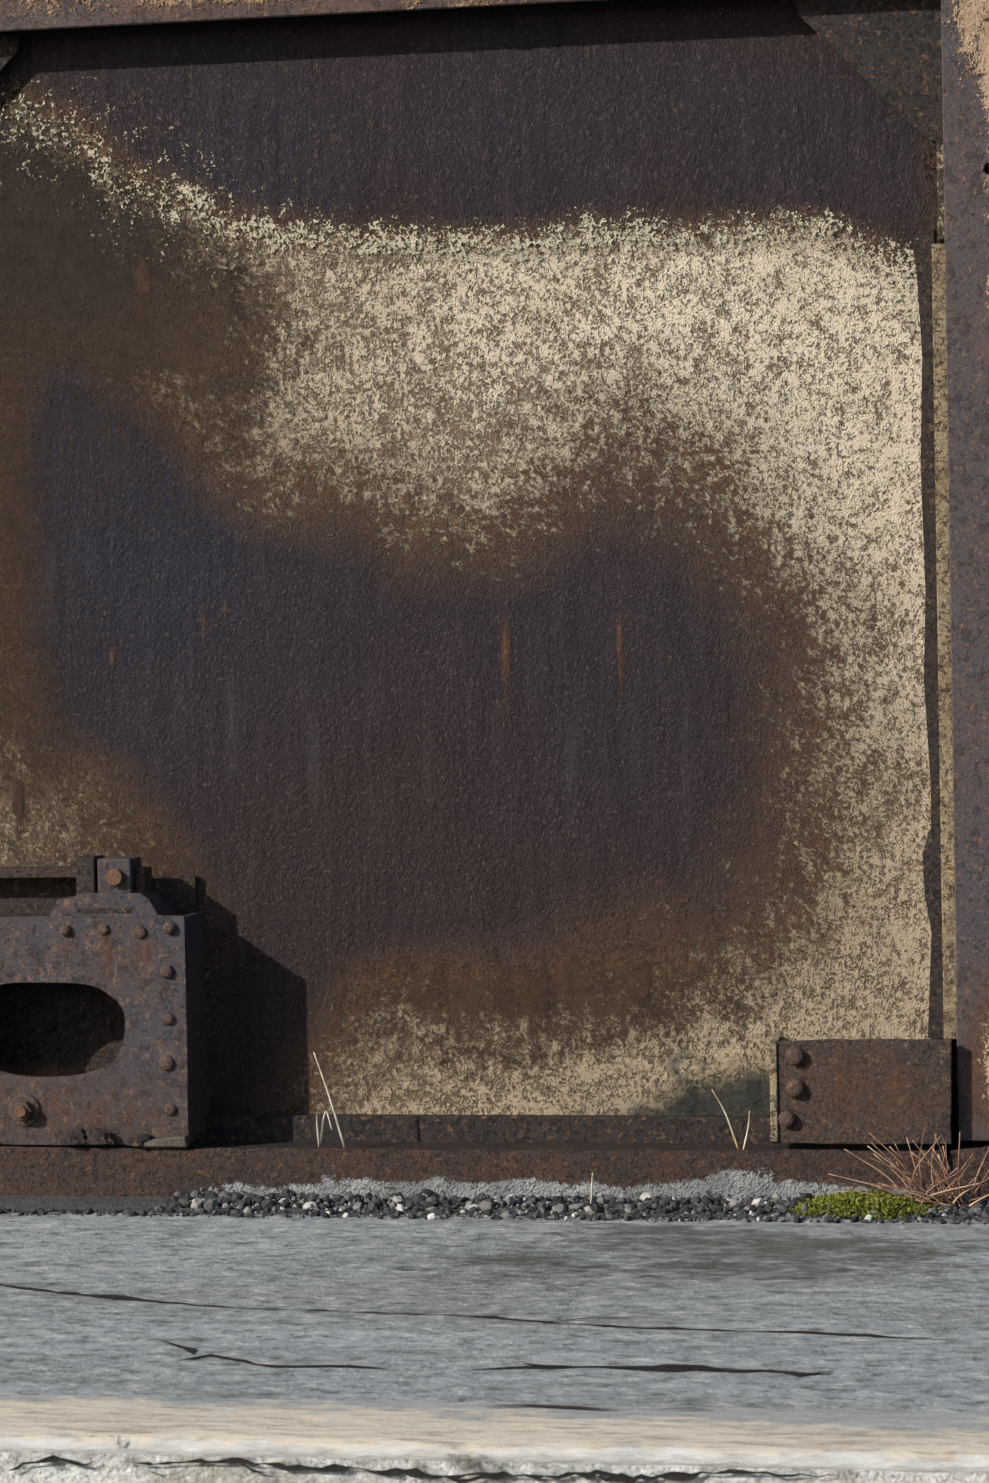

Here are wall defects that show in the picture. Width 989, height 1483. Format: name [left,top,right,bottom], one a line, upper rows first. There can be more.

rust [0,0,941,1114]
crack [0,1284,964,1376]
crack [484,1403,617,1411]
crack [8,1455,829,1483]